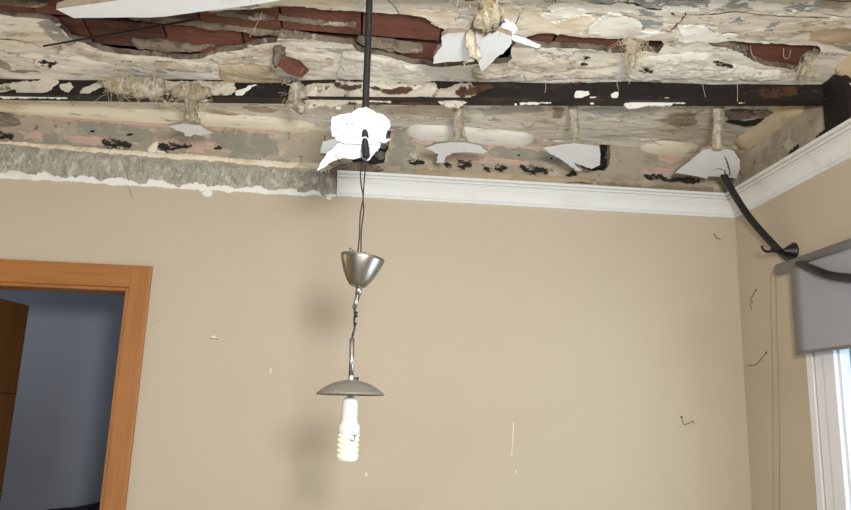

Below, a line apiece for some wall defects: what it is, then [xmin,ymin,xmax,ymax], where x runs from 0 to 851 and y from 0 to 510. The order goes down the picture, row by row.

flaking render [0,0,459,61]
peeling [518,0,851,66]
peeling [204,106,287,116]
flaking render [725,118,765,127]
spalling [374,134,390,160]
spalling [581,145,608,171]